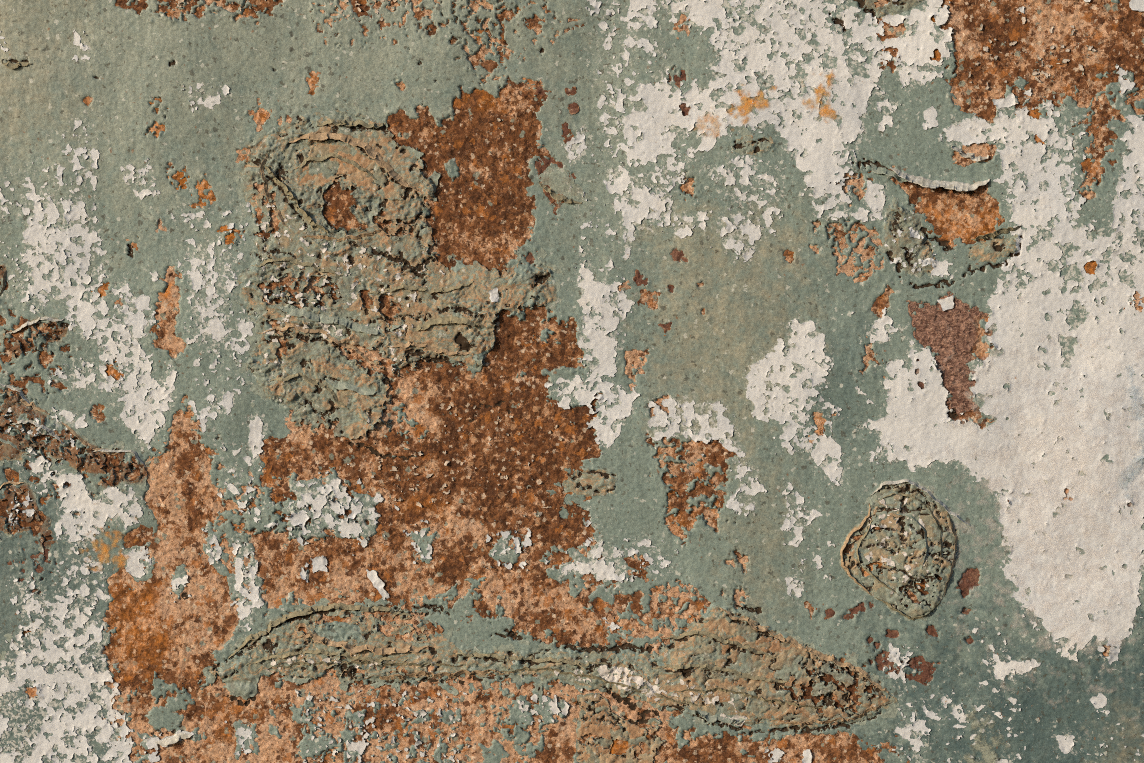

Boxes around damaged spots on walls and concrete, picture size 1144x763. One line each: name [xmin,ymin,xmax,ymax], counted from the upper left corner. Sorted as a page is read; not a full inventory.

peeling [0,120,178,455]
peeling [171,203,428,433]
rust [310,0,585,276]
peeling [543,0,955,516]
rust [874,0,906,73]
rust [888,166,1005,248]
rust [906,291,994,429]
peeling [855,24,1144,672]
rust [930,0,1144,203]
peeling [0,407,194,763]
rust [0,290,942,763]
peeling [883,618,1041,763]